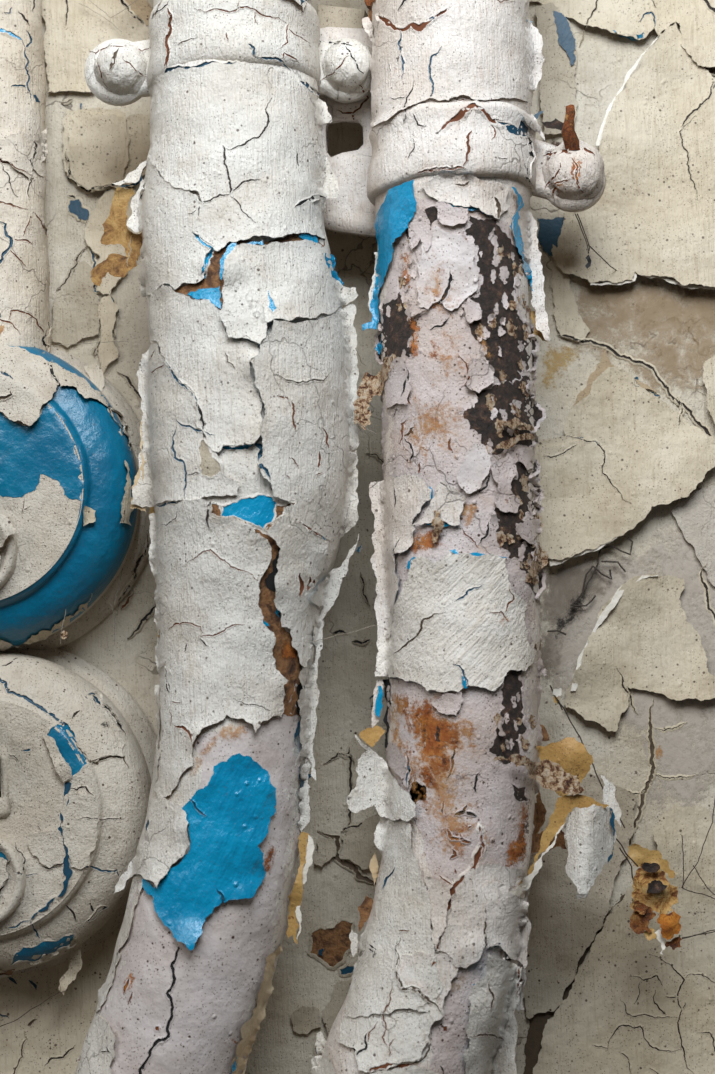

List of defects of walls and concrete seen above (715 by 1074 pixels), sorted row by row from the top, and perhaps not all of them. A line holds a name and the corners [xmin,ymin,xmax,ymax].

crack [0,140,146,402]
peeling [52,103,150,391]
crack [188,97,272,223]
crack [89,0,595,202]
peeling [0,343,132,501]
peeling [114,62,358,894]
corrosion [374,201,546,605]
peeling [250,0,715,1074]
peeling [75,492,320,1074]
corrosion [371,670,536,851]
corrosion [505,799,535,867]
crack [523,894,625,1074]